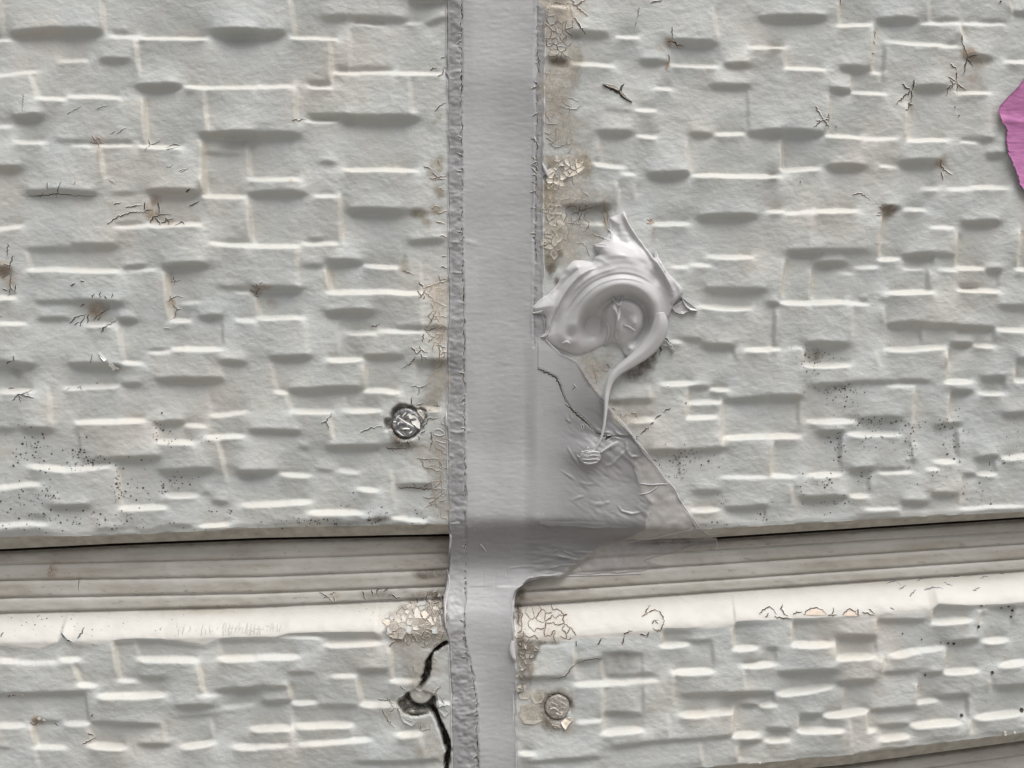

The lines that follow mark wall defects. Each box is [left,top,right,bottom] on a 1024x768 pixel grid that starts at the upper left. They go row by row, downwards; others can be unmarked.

crack [430,56,446,112]
crack [360,160,451,520]
water stain [0,423,199,533]
water stain [797,383,1024,515]
peeling [759,603,875,620]
crack [362,587,451,768]
peeling [518,689,573,730]